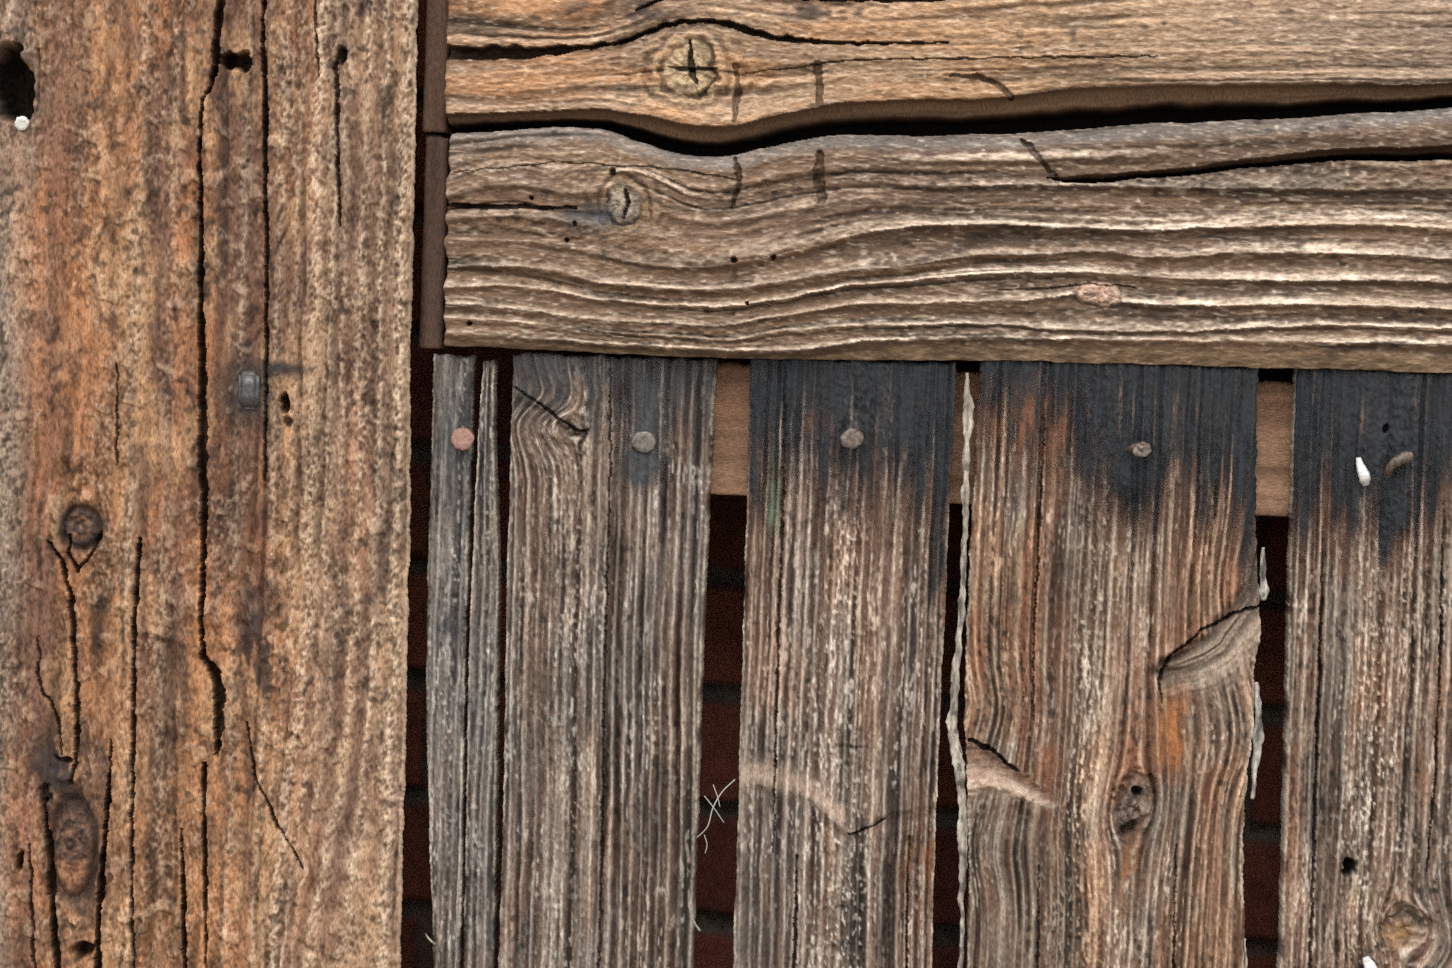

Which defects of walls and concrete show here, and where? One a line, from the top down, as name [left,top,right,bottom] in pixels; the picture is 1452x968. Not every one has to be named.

crack [313,0,342,227]
crack [179,0,304,968]
crack [27,531,143,968]
crack [967,738,1020,773]
crack [1157,605,1259,703]